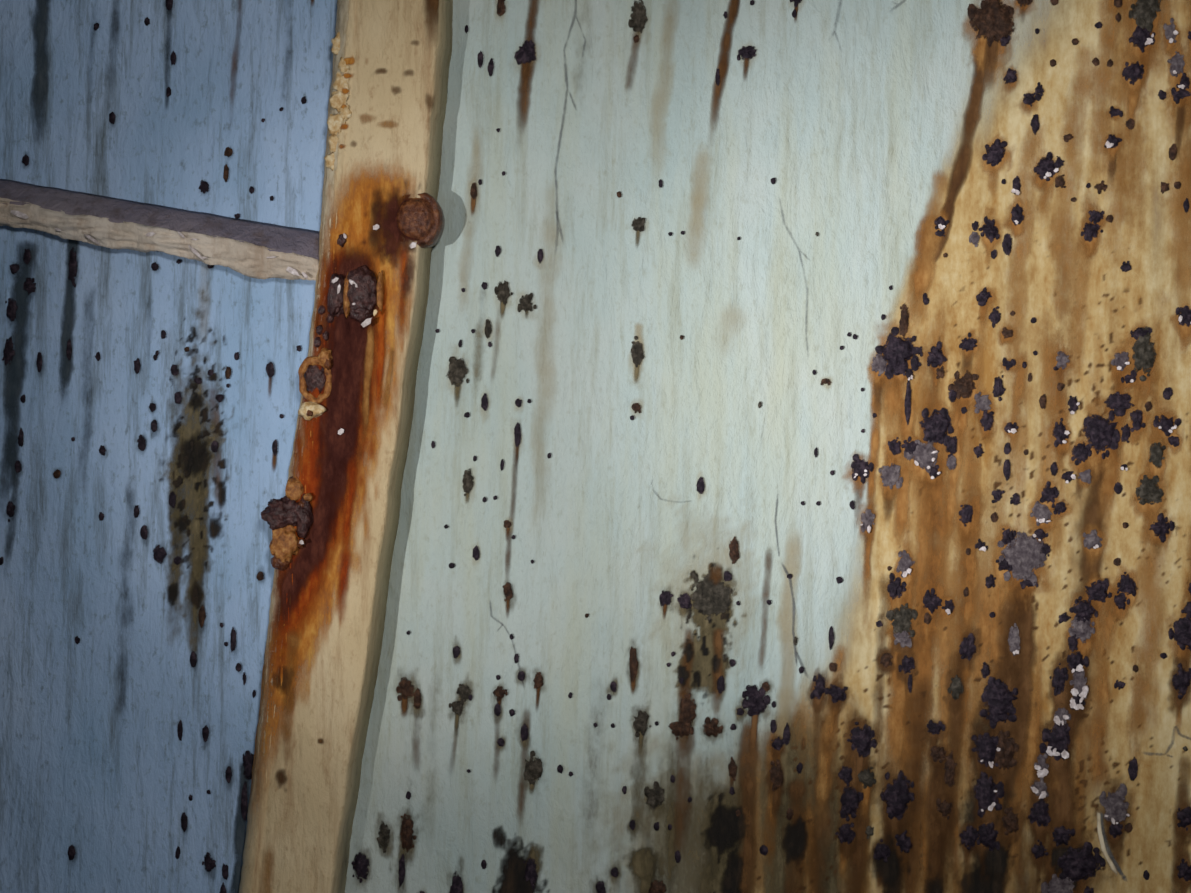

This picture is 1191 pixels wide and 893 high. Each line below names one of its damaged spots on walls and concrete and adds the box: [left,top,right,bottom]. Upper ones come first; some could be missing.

rust [514,0,538,122]
rust [235,169,417,821]
rust [622,0,1191,893]